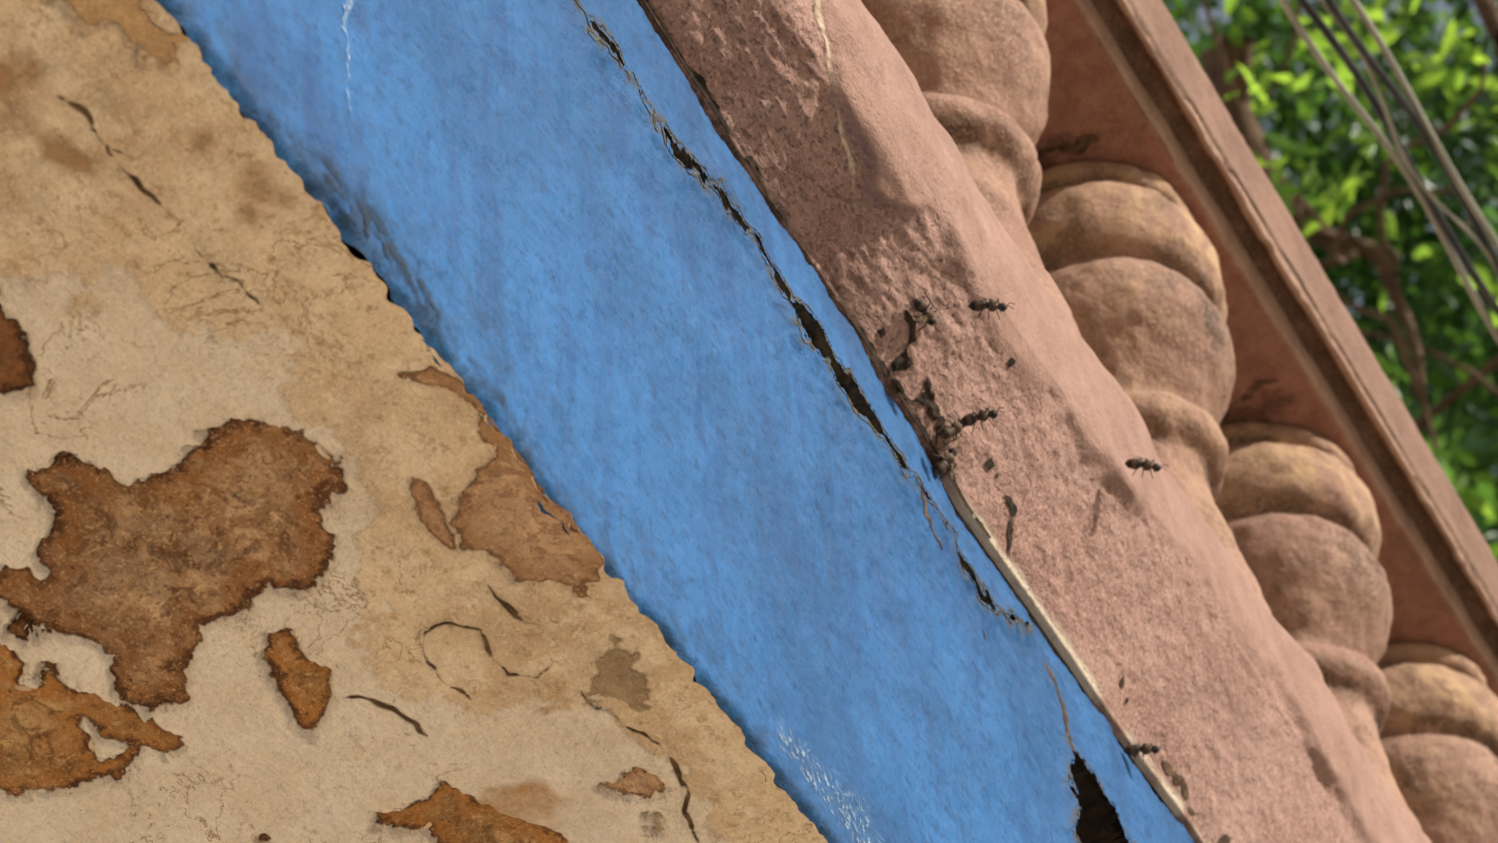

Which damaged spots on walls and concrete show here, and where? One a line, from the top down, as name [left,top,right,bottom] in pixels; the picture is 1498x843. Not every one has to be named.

crack [577,0,1032,639]
peeling [397,366,606,598]
peeling [0,418,348,797]
peeling [376,781,568,843]
hole [1047,667,1131,843]